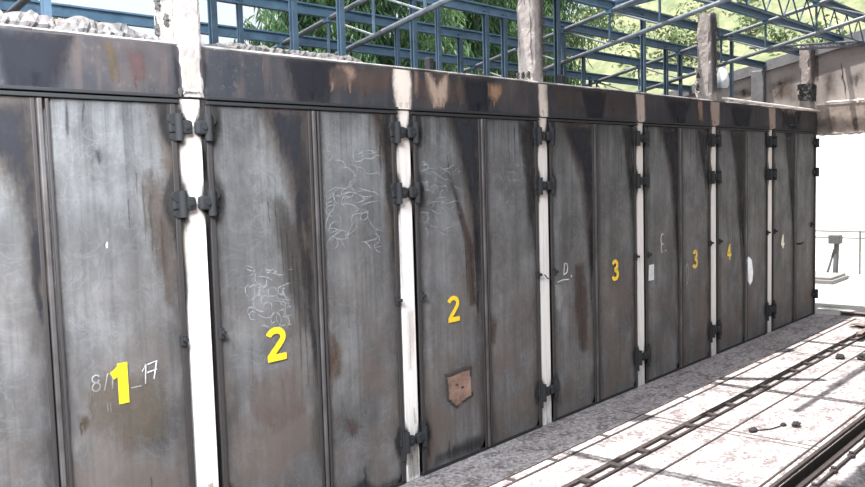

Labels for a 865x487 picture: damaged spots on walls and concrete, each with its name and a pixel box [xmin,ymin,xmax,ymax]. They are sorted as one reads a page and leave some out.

damp [447,160,479,311]
rust [576,266,587,350]